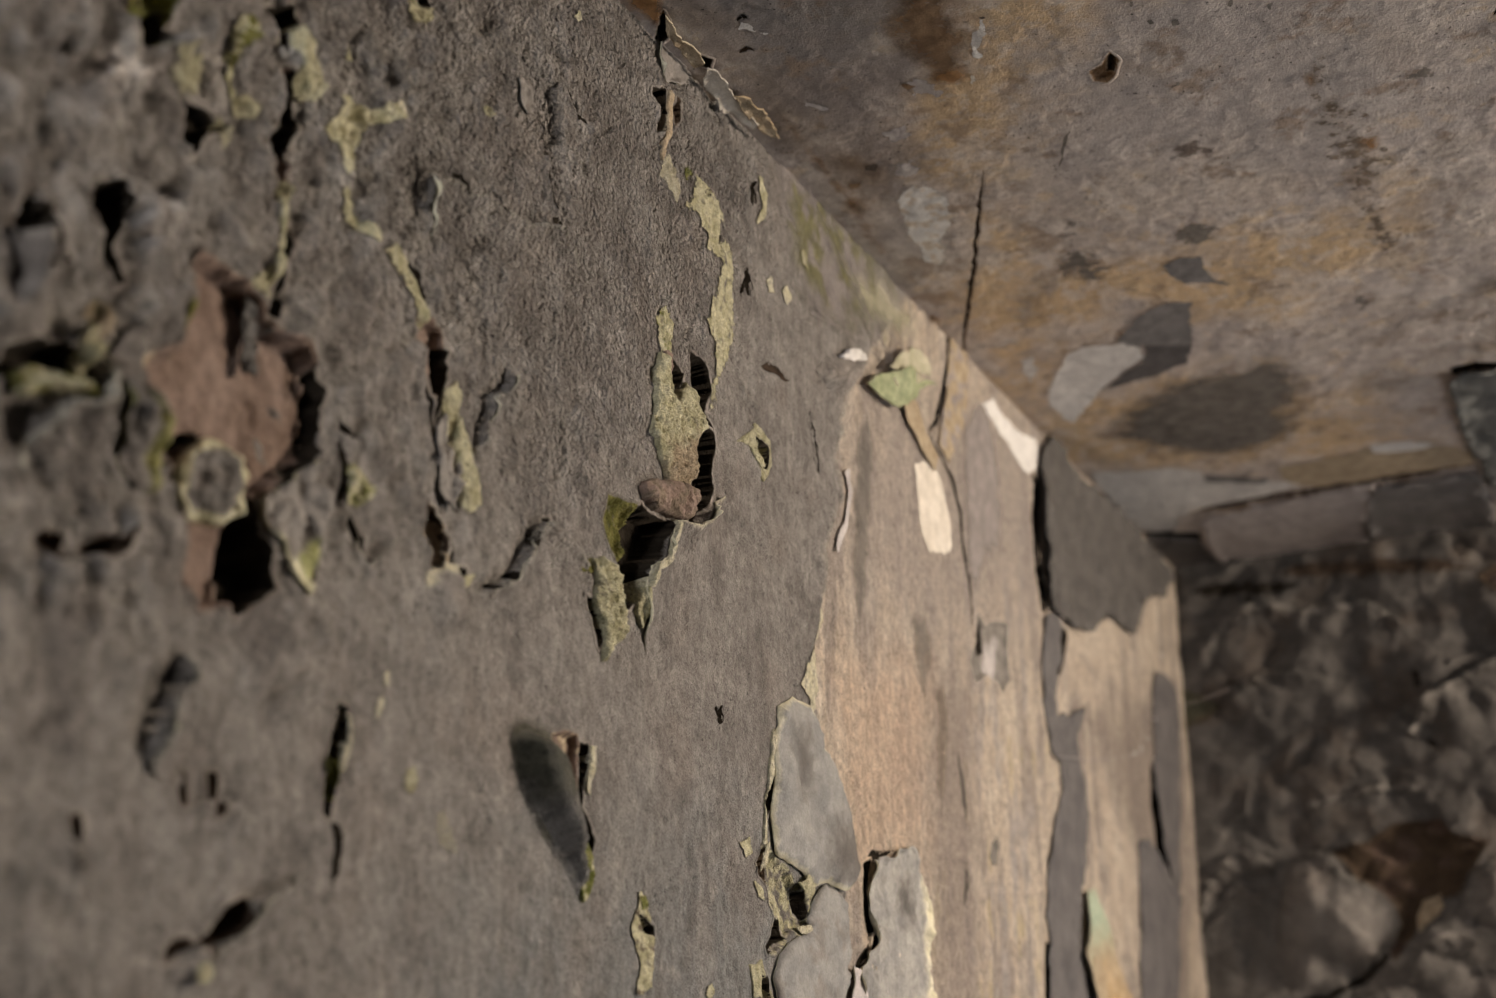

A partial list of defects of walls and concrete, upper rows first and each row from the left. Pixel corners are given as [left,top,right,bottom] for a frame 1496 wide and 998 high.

flaking render [119,0,184,52]
flaking render [178,90,229,163]
peeling [652,8,779,139]
flaking render [87,173,141,292]
flaking render [0,248,335,623]
peeling [386,243,521,571]
flaking render [601,349,733,653]
peeling [1020,302,1193,422]
damp [1122,364,1303,454]
peeling [736,394,938,998]
peeling [867,337,1496,998]
flaking render [159,873,304,994]